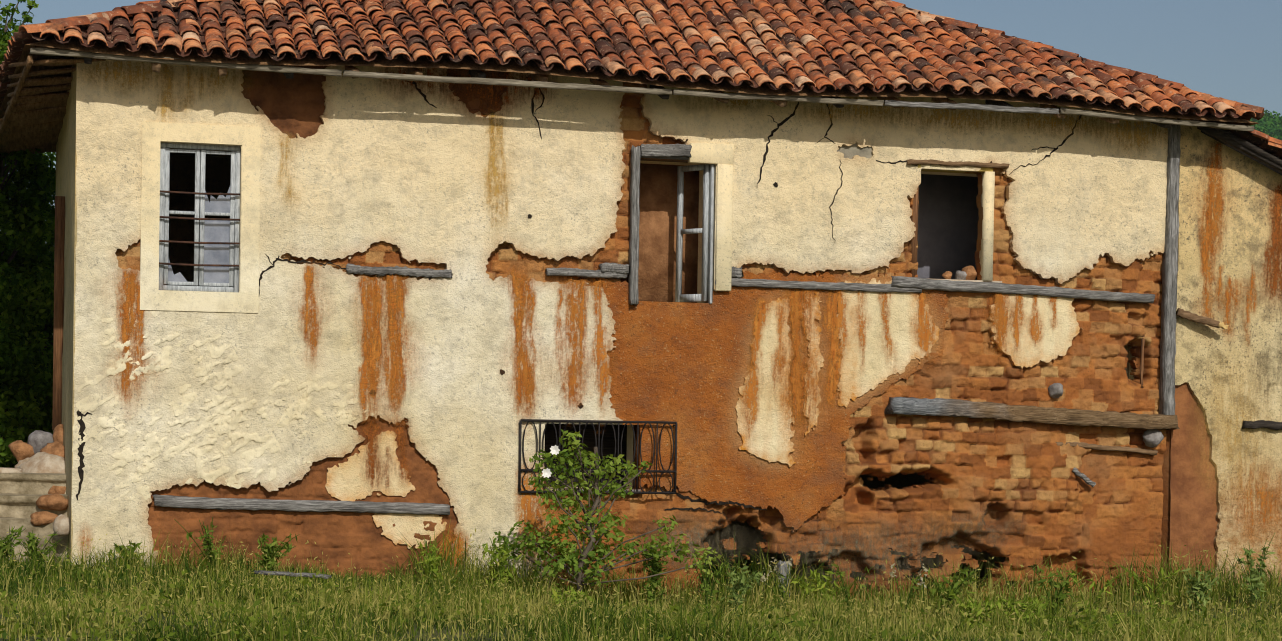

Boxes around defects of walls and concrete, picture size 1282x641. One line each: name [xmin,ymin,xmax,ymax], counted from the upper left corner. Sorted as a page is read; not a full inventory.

spalling [241,65,327,139]
spalling [446,68,508,118]
crack [757,102,843,240]
crack [1009,109,1085,175]
spalling [281,241,446,281]
spalling [486,82,1218,601]
crack [76,410,92,500]
spalling [72,311,458,580]